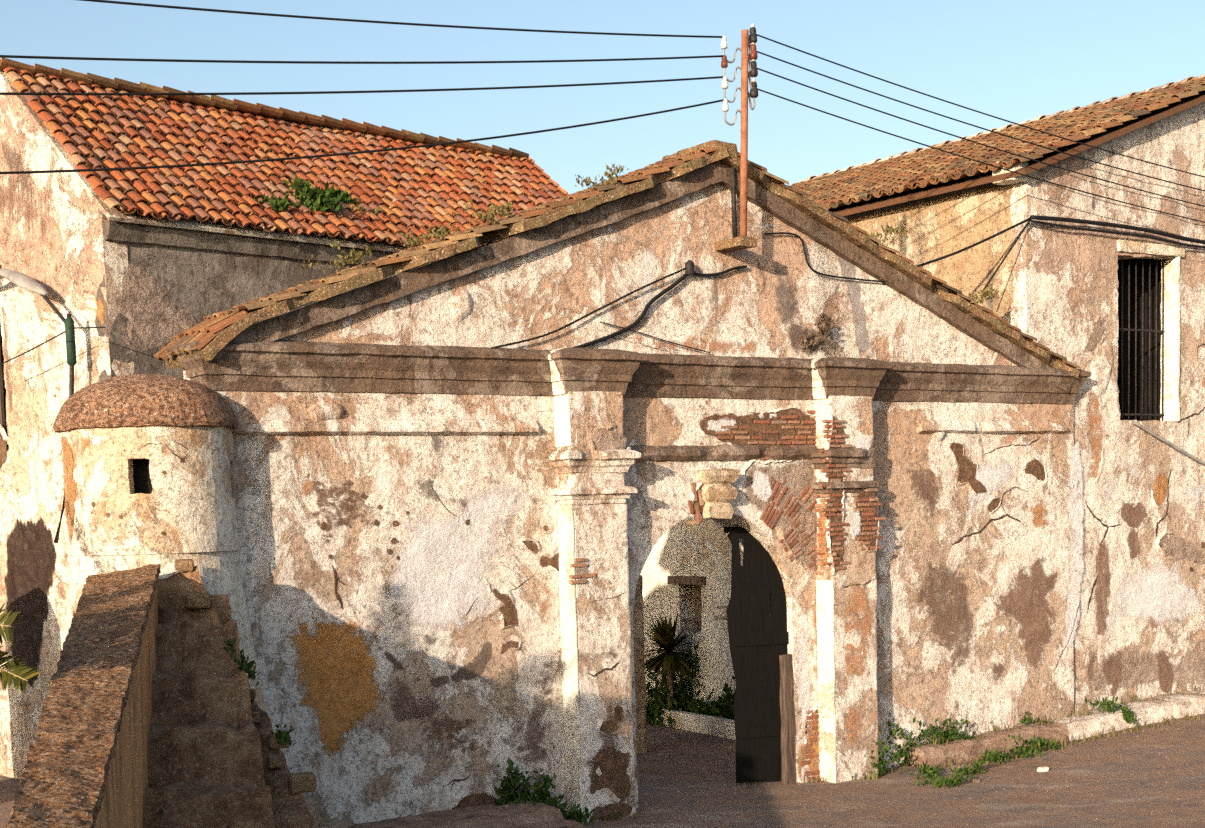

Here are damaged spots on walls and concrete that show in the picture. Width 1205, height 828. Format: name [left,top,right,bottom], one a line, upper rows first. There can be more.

flaking render [285,614,389,770]
peeling [306,473,596,654]
flaking render [698,405,886,576]
flaking render [796,613,821,781]
water stain [918,561,973,668]
crack [953,487,1028,545]
spalling [947,440,1047,515]
water stain [996,556,1059,667]
crack [1053,500,1120,672]
peeling [1061,383,1205,659]